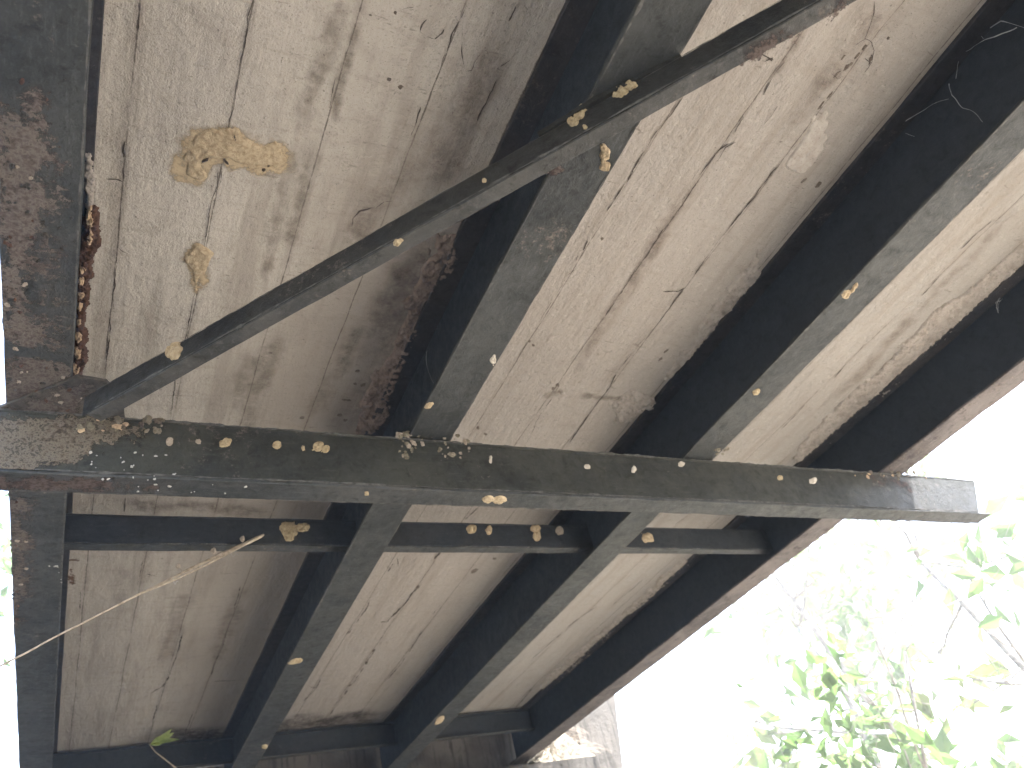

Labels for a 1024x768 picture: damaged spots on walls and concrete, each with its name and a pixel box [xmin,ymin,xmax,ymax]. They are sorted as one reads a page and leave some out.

crack [228,0,254,128]
crack [109,141,125,182]
crack [204,166,222,246]
crack [543,97,683,315]
crack [603,54,784,319]
rust [0,78,158,628]
crack [105,250,123,369]
crack [570,149,792,442]
crack [348,587,419,633]
crack [152,636,182,725]